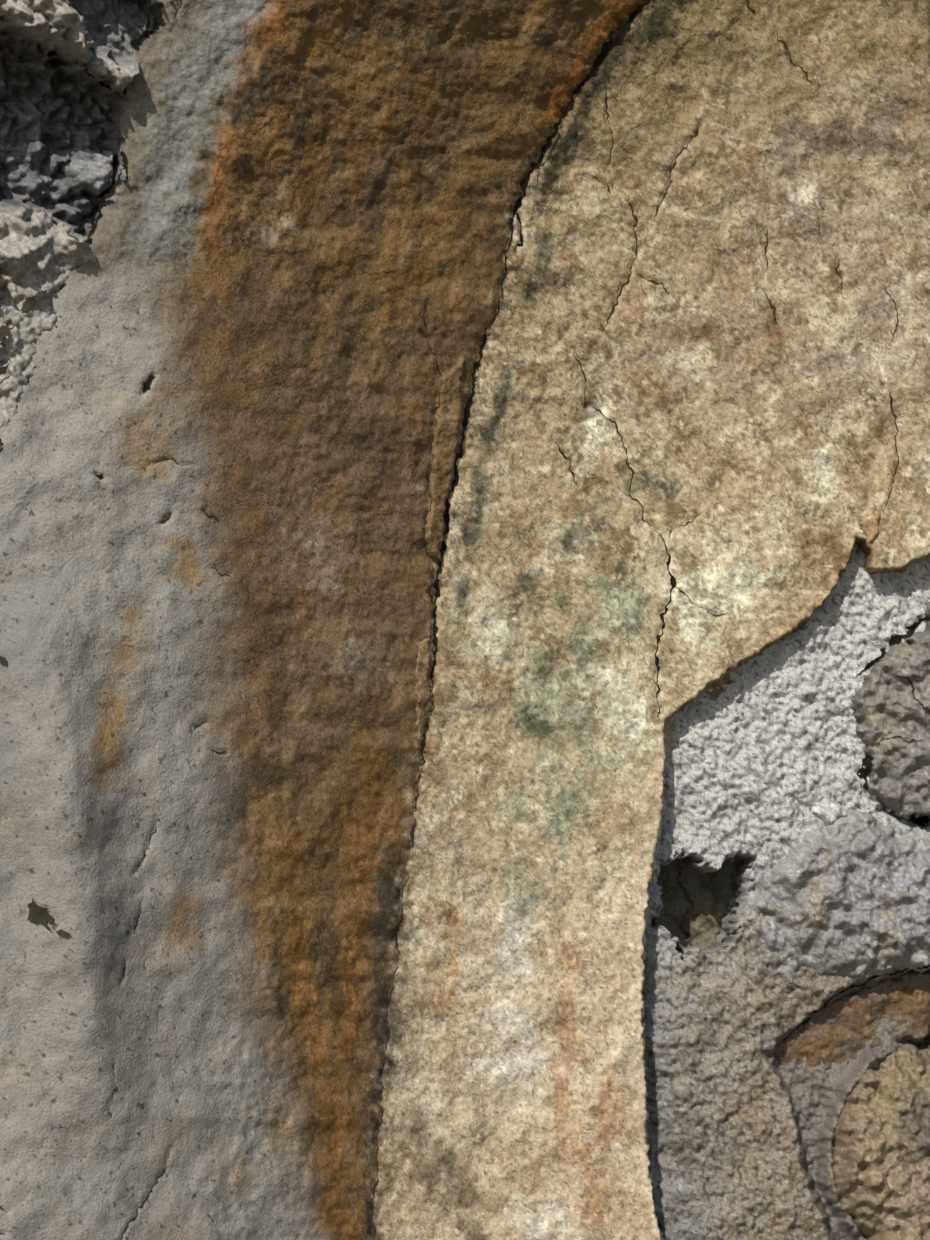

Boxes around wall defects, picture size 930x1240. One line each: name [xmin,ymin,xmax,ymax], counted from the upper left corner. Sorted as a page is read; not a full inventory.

corrosion [224,0,304,75]
corrosion [184,100,305,273]
spalling [0,290,47,341]
crack [765,227,777,324]
corrosion [93,337,227,765]
crack [371,0,702,1240]
crack [572,348,727,720]
crack [853,609,930,790]
flaking render [28,898,71,937]
flaking render [642,511,930,1240]
crack [908,812,930,827]
corrosion [107,1085,314,1240]